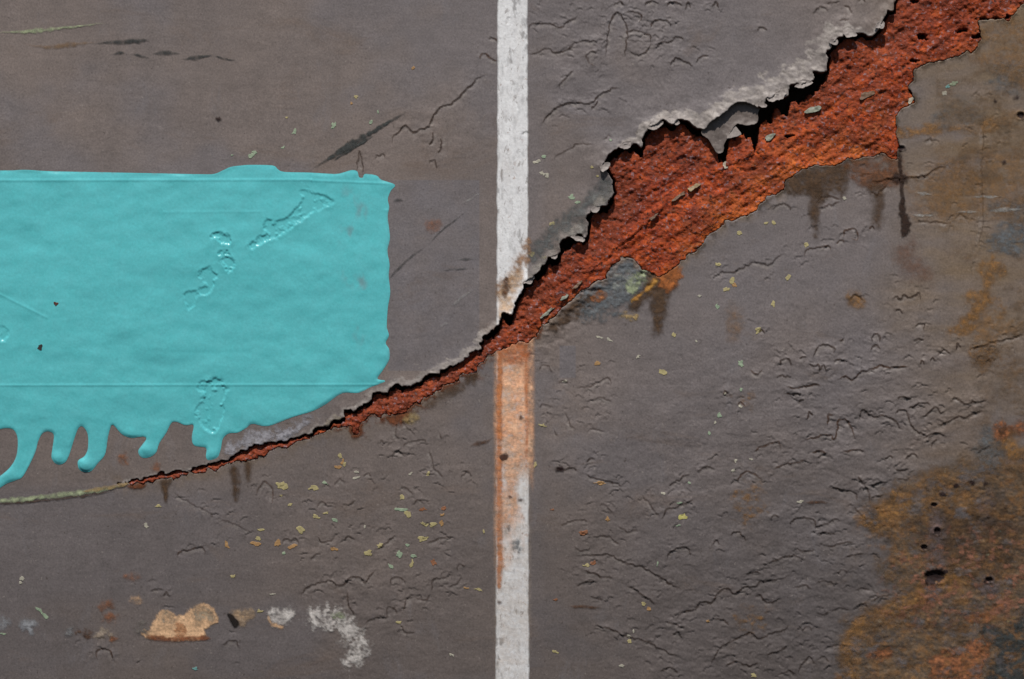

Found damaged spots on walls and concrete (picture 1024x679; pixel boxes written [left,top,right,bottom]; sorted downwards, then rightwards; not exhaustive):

crack [398,77,480,145]
rust [117,0,1024,588]
peeling [225,415,341,454]
crack [755,323,1016,471]
spalling [388,495,446,569]
rust [840,421,1024,679]
crack [687,586,777,666]